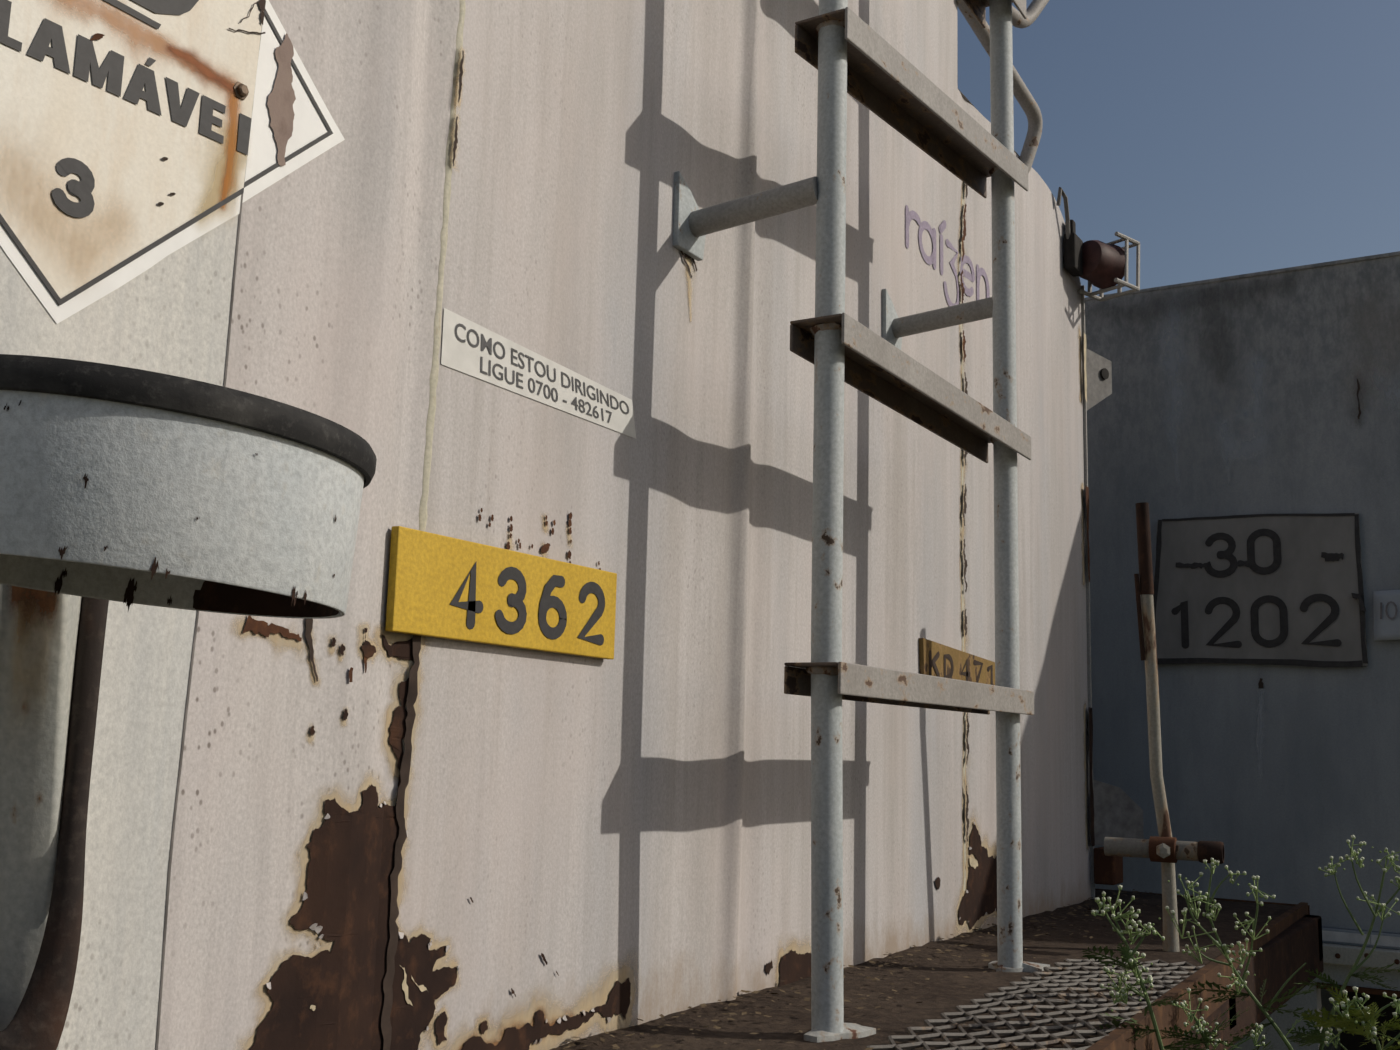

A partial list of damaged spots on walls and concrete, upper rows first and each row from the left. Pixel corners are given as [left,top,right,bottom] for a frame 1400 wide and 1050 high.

rust [478,508,572,563]